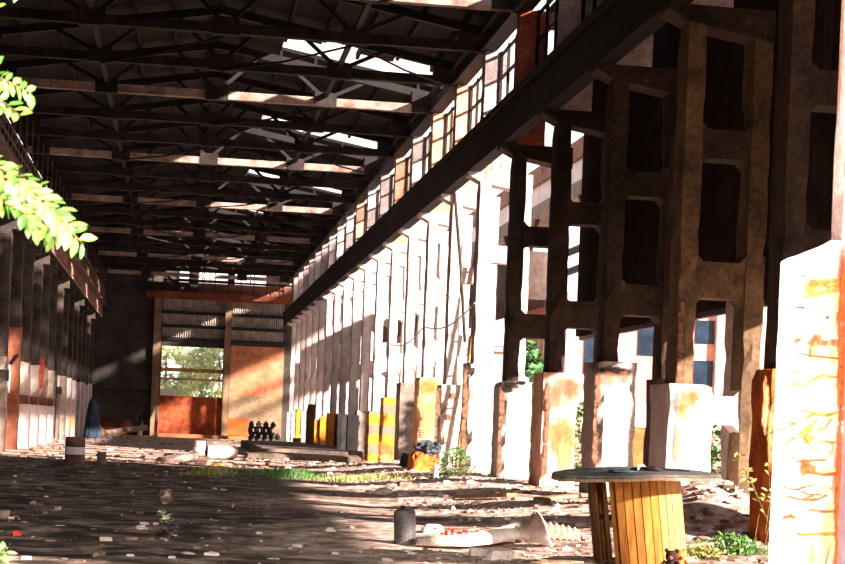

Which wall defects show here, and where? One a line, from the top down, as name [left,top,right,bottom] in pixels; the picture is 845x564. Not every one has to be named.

corrosion [674,390,701,463]
corrosion [762,246,845,564]